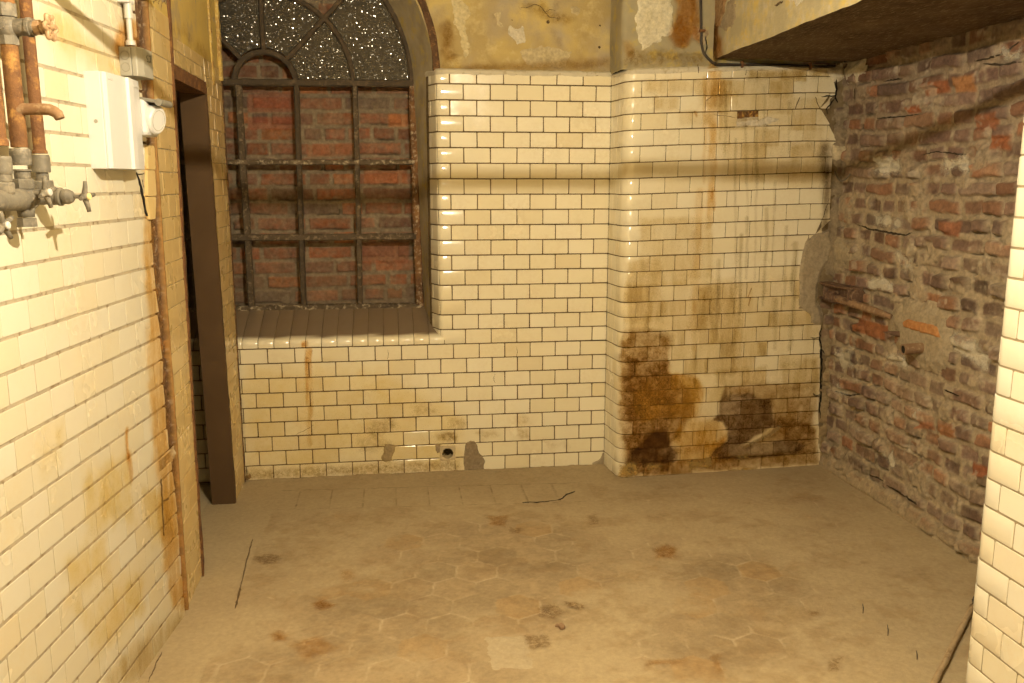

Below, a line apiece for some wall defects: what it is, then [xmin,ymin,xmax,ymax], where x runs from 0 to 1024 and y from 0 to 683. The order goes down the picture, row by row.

peeling [494,12,572,68]
peeling [635,0,673,51]
spalling [735,111,779,128]
crack [795,79,838,114]
flaking render [903,319,941,338]
crack [235,539,253,609]